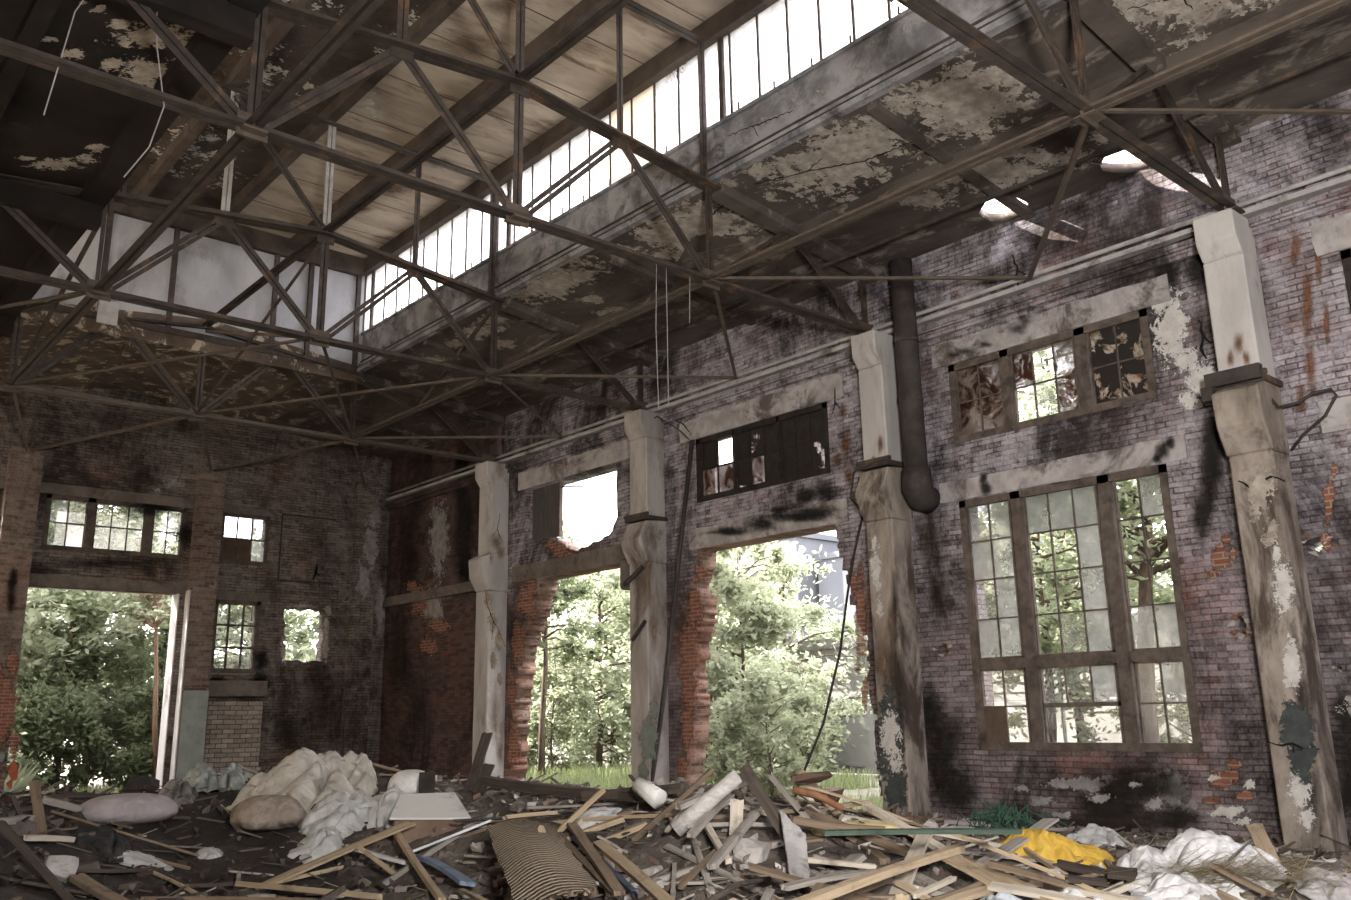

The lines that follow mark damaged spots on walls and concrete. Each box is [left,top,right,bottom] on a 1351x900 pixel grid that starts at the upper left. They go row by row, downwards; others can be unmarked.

peeling [41,0,195,88]
peeling [1112,0,1279,55]
peeling [16,144,109,171]
peeling [717,46,1055,213]
peeling [617,192,771,262]
peeling [1149,277,1215,410]
water stain [1206,416,1221,466]
water stain [796,489,815,503]
water stain [1194,497,1210,539]
peeling [847,535,908,813]
peeling [1247,459,1318,833]
water stain [1306,776,1319,815]